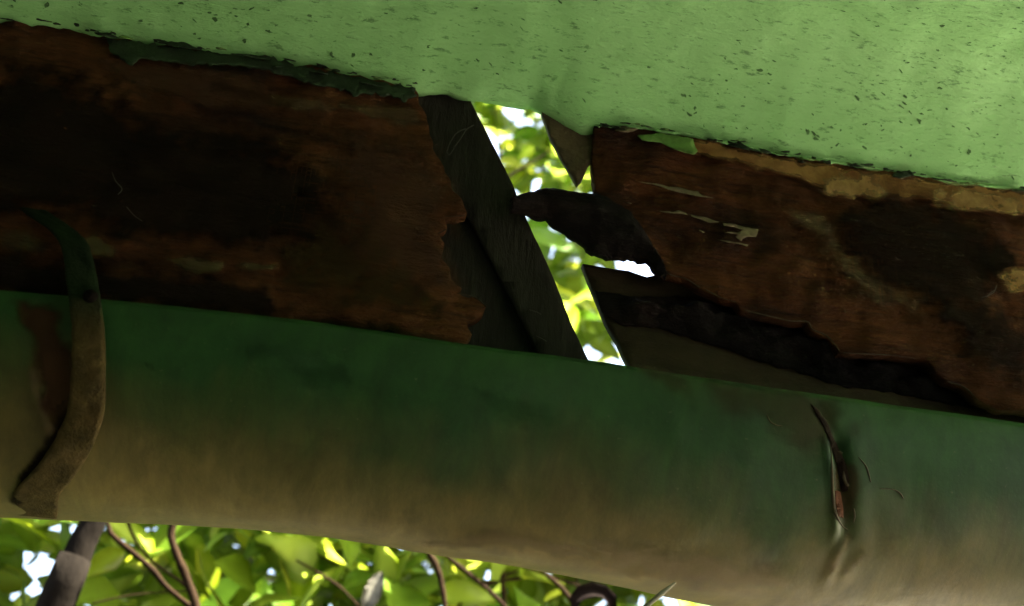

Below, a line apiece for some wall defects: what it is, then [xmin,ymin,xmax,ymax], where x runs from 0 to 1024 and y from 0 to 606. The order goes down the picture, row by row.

peeling [74,18,425,103]
spalling [855,75,930,125]
peeling [597,96,1024,192]
peeling [639,181,712,198]
peeling [660,210,758,246]
crack [811,405,904,530]